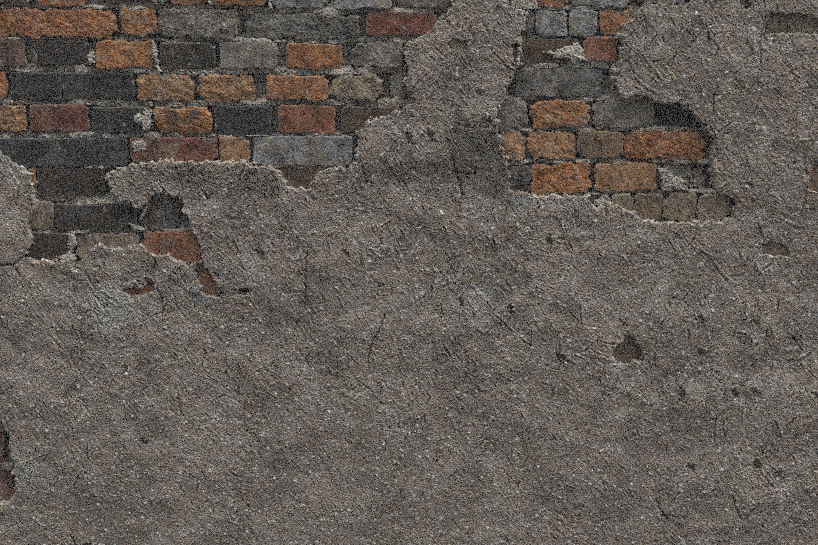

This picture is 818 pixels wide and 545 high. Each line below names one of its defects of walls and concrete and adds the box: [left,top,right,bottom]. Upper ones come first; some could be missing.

spalling [740,0,755,10]
spalling [446,38,469,53]
spalling [495,0,742,226]
spalling [0,0,452,299]
spalling [808,160,818,194]
spalling [611,318,645,366]
spalling [0,421,17,506]